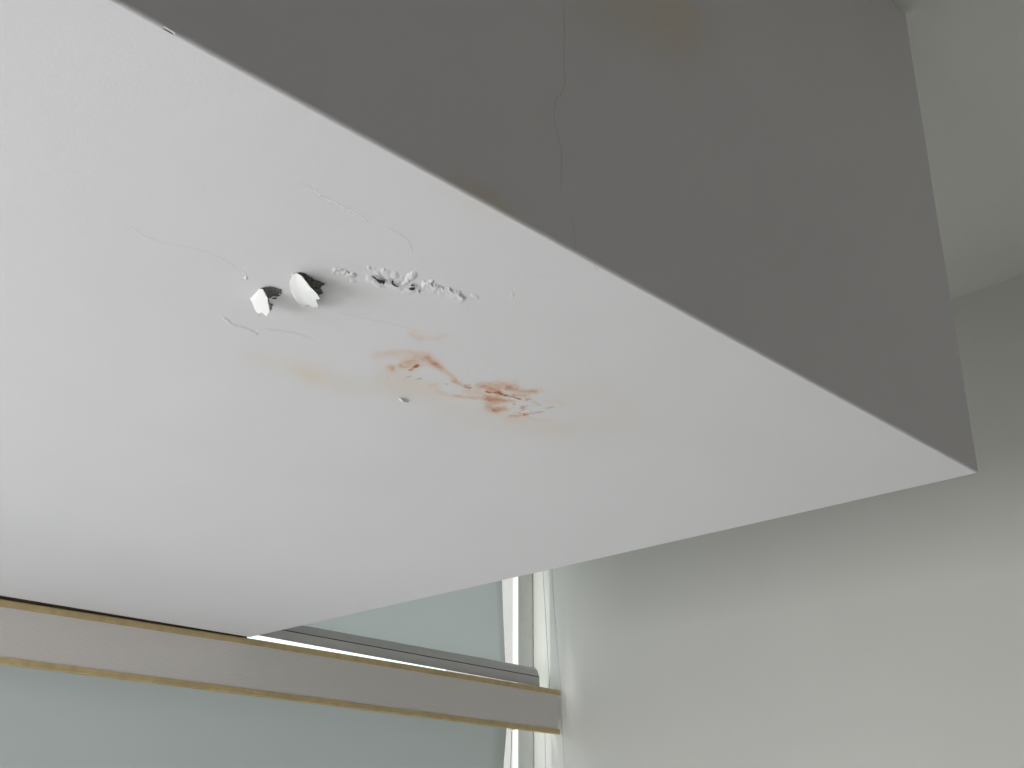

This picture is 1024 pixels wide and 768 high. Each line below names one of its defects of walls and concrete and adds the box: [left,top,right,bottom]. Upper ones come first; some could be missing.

peeling [250,272,324,317]